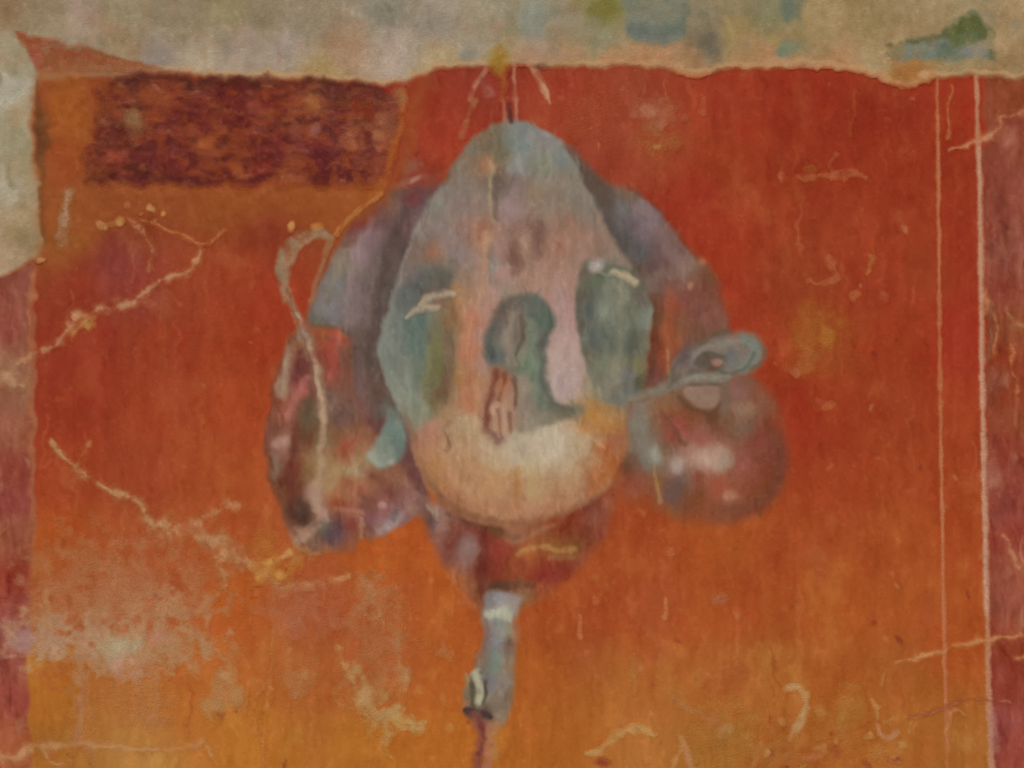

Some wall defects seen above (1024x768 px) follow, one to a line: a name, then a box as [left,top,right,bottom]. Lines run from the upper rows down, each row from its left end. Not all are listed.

flaking render [0,0,1024,280]
crack [943,81,1024,154]
crack [0,213,229,395]
crack [46,433,360,599]
crack [878,629,1024,689]